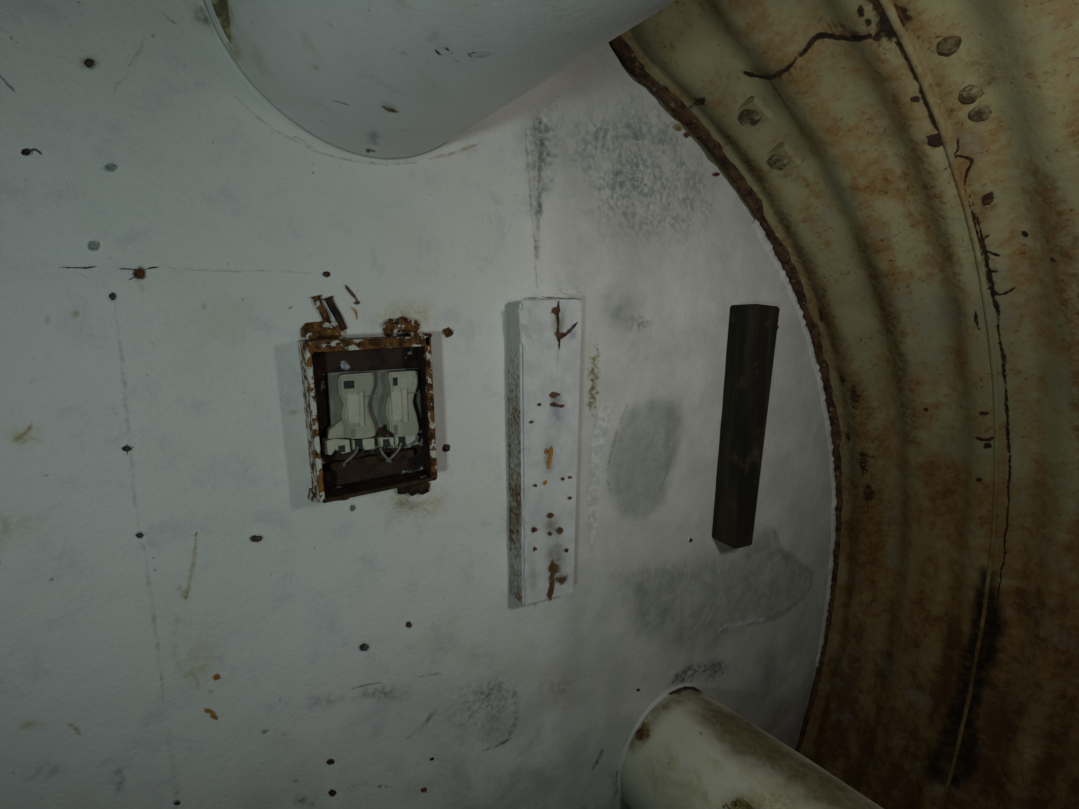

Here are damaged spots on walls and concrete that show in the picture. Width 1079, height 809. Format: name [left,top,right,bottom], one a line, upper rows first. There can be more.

corrosion [979,231,1015,316]
corrosion [975,403,1010,452]
corrosion [533,446,553,487]